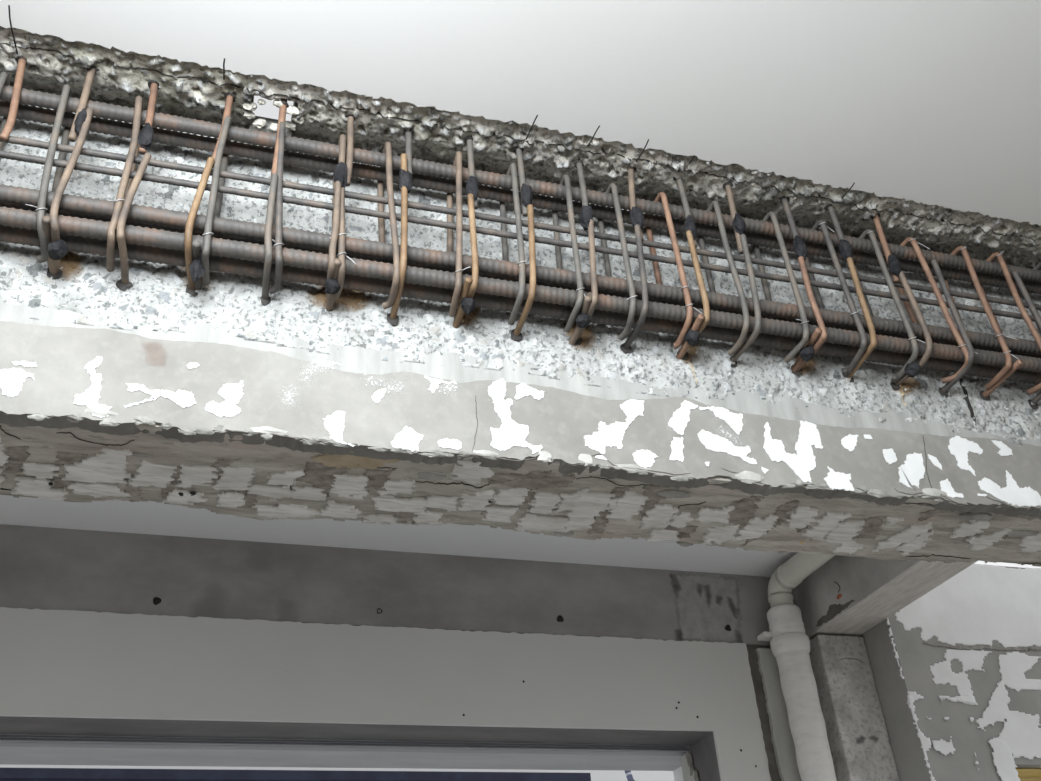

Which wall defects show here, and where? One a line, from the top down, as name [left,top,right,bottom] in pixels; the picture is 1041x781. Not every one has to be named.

spalling [243,99,304,132]
crack [0,43,1038,241]
spalling [0,116,213,216]
corrosion [60,251,81,276]
spalling [220,155,1041,341]
corrosion [313,286,369,310]
corrosion [457,305,480,325]
corrosion [566,322,594,347]
corrosion [899,377,919,393]
crack [959,379,976,425]
flaking render [0,242,1041,781]